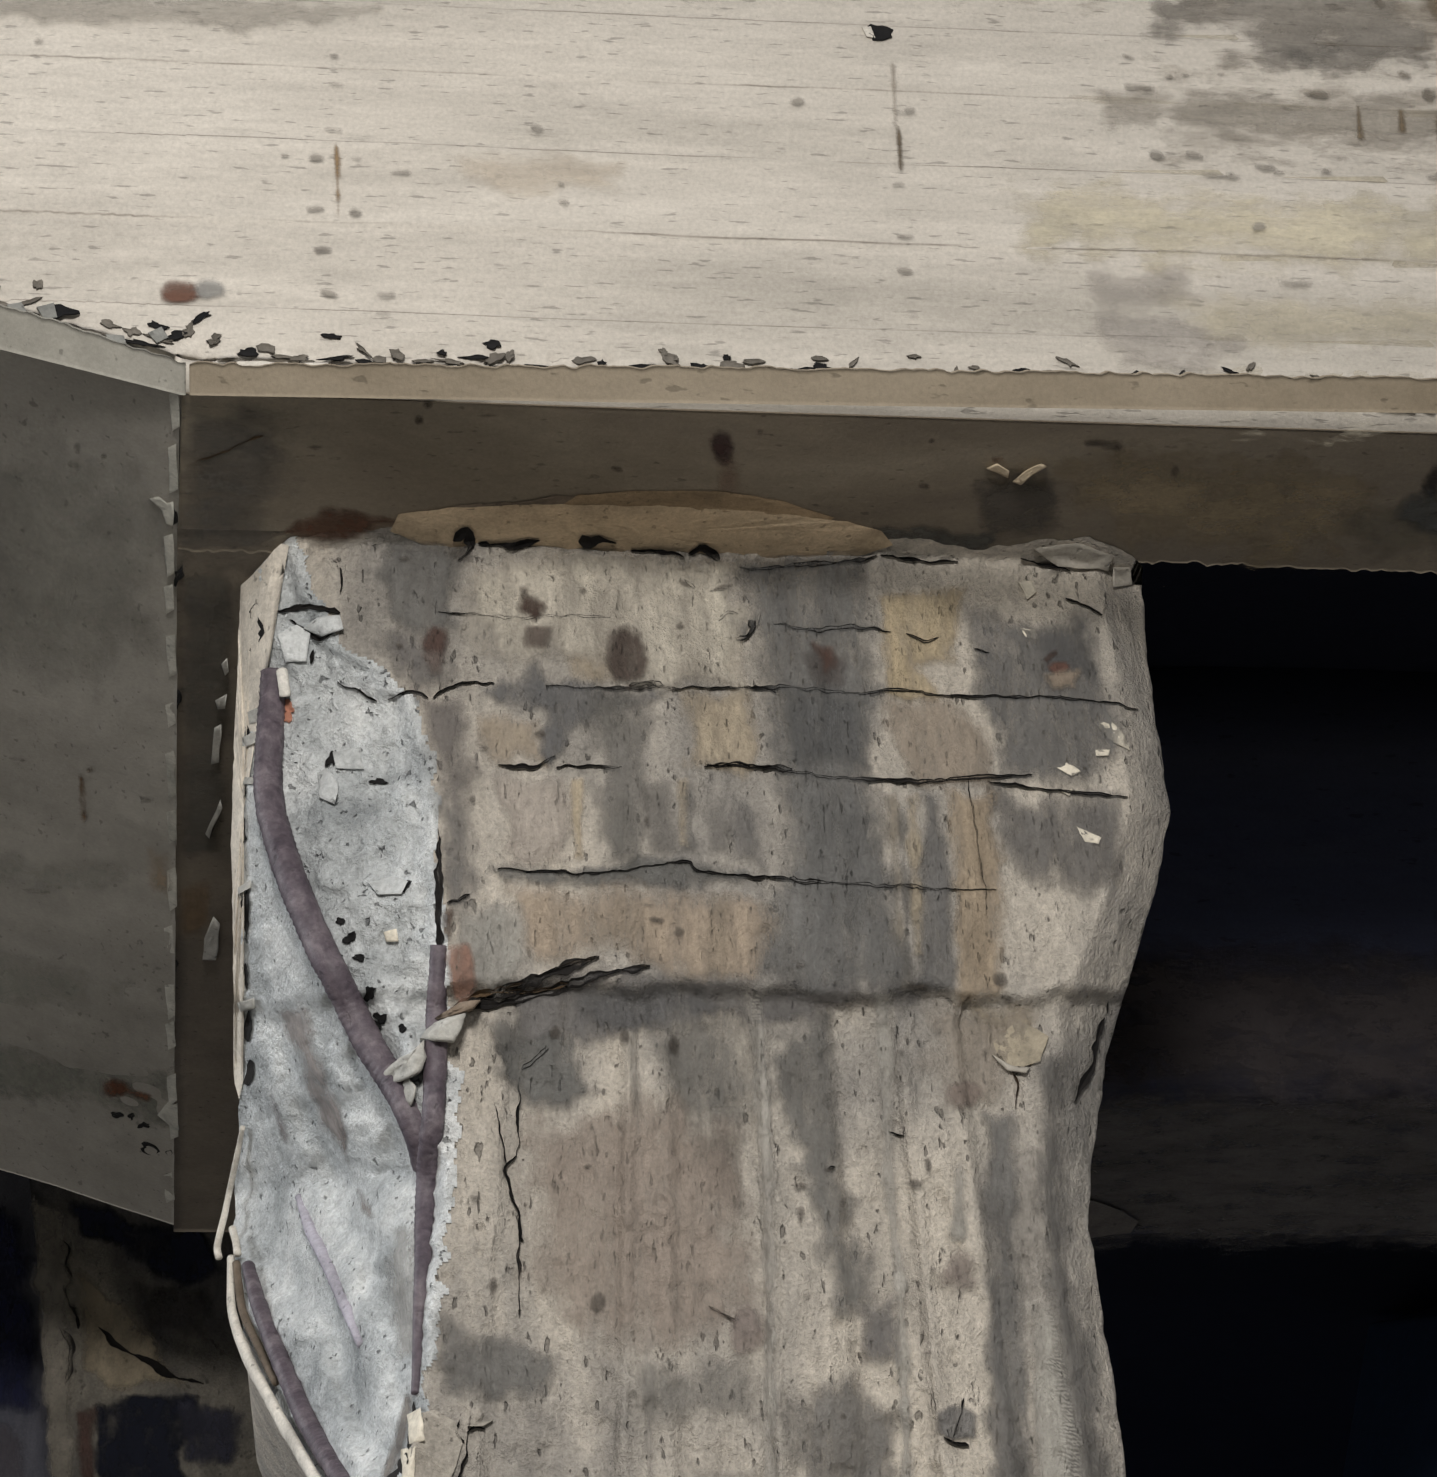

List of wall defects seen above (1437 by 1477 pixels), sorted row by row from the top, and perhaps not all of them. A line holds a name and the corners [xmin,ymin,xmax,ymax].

water stain [1109,99,1437,139]
water stain [1153,0,1437,69]
spalling [150,393,185,614]
water stain [1065,453,1437,560]
crack [498,755,622,769]
crack [498,761,1128,914]
spalling [164,867,179,1050]
spalling [233,536,493,1477]
crack [454,956,650,1010]
water stain [382,543,1118,1477]
crack [496,1046,548,1318]
peeling [32,1202,241,1477]